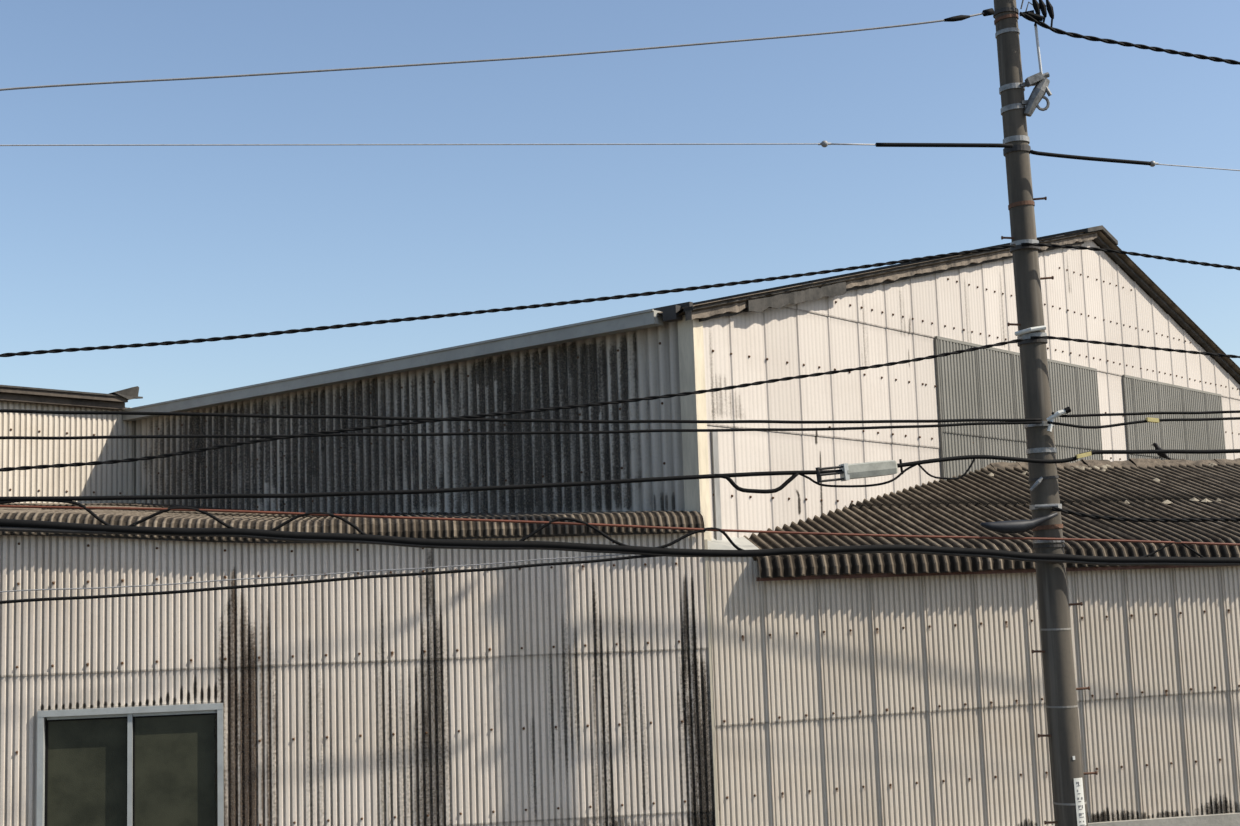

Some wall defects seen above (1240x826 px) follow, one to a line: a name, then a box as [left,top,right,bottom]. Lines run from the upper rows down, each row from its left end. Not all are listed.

leakage [145,333,641,514]
leakage [654,495,675,511]
leakage [41,569,277,826]
leakage [381,642,392,826]
leakage [409,548,451,826]
leakage [551,631,578,756]
leakage [592,582,637,826]
leakage [678,578,719,826]
leakage [1087,796,1238,822]